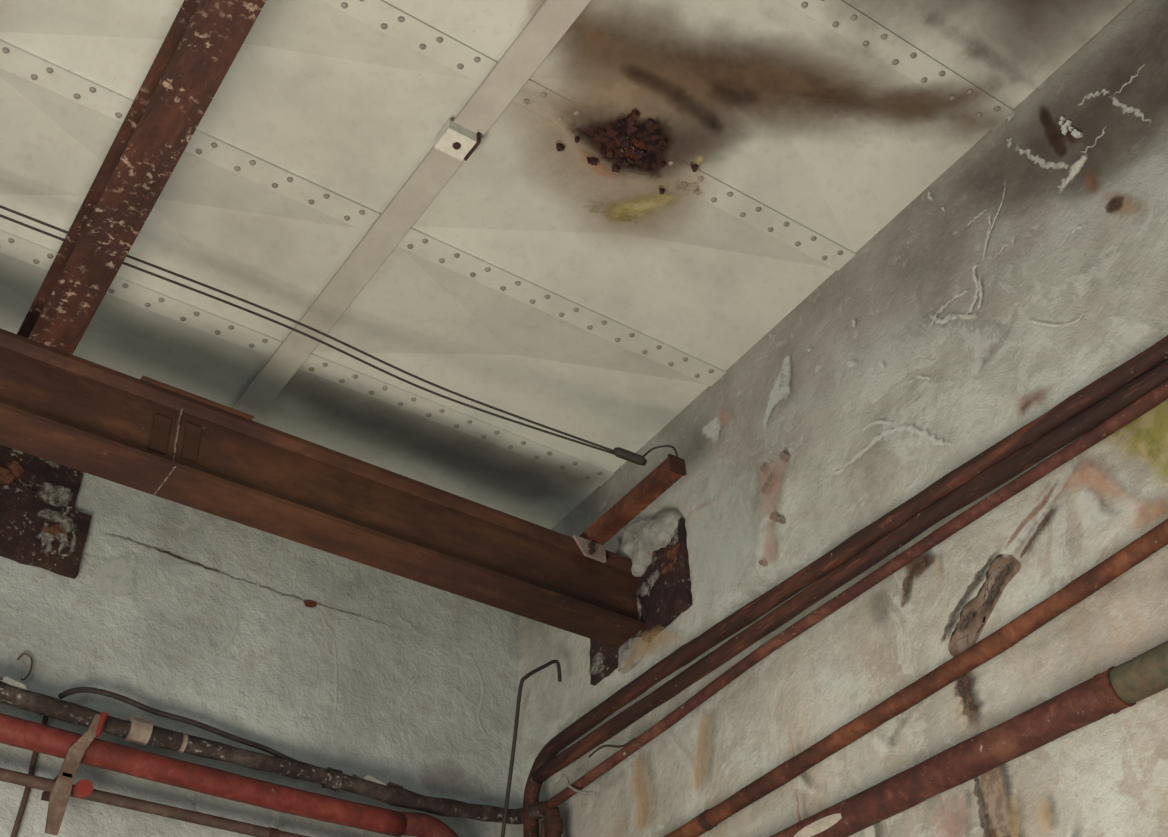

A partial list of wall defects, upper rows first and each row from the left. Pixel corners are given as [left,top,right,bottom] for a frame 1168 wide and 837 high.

leakage [566,13,970,121]
crack [113,535,361,616]
flaking render [941,467,1072,657]
peeling [864,705,916,752]
flaking render [954,674,979,726]
flaking render [974,767,1012,837]